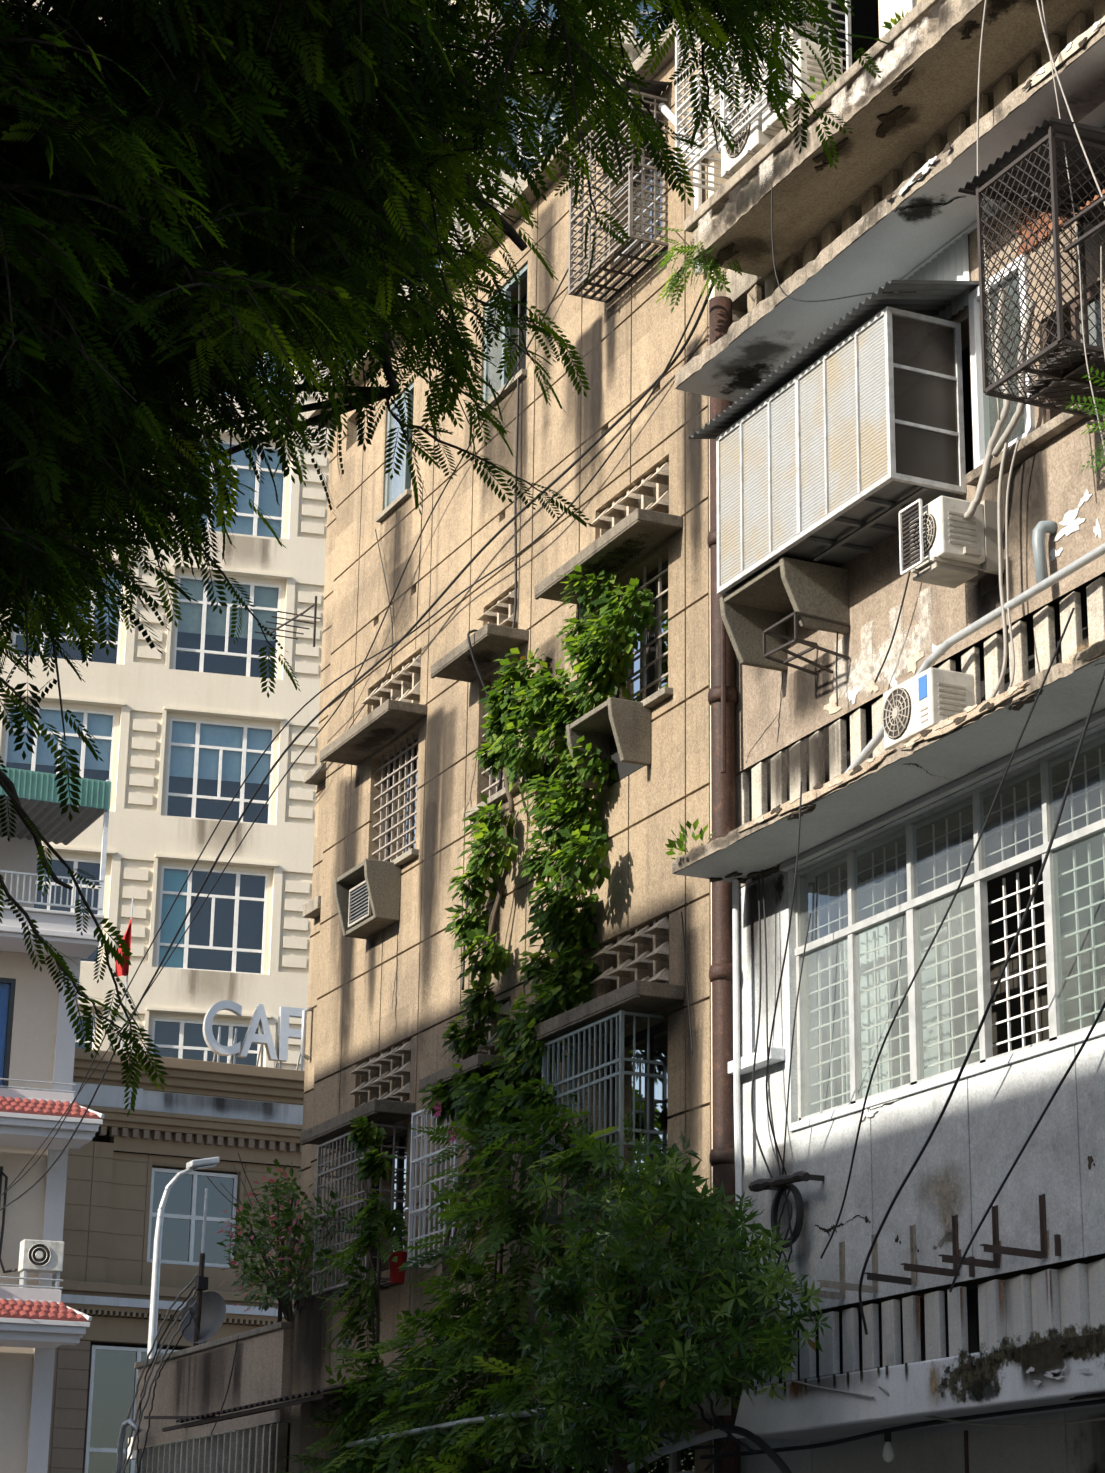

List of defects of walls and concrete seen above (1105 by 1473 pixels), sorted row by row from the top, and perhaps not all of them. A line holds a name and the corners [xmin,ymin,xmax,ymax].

leakage [985,0,1046,22]
leakage [891,195,966,222]
leakage [687,338,699,363]
leakage [721,342,787,395]
leakage [684,392,701,547]
peeling [1050,489,1102,561]
leakage [930,1323,1105,1403]